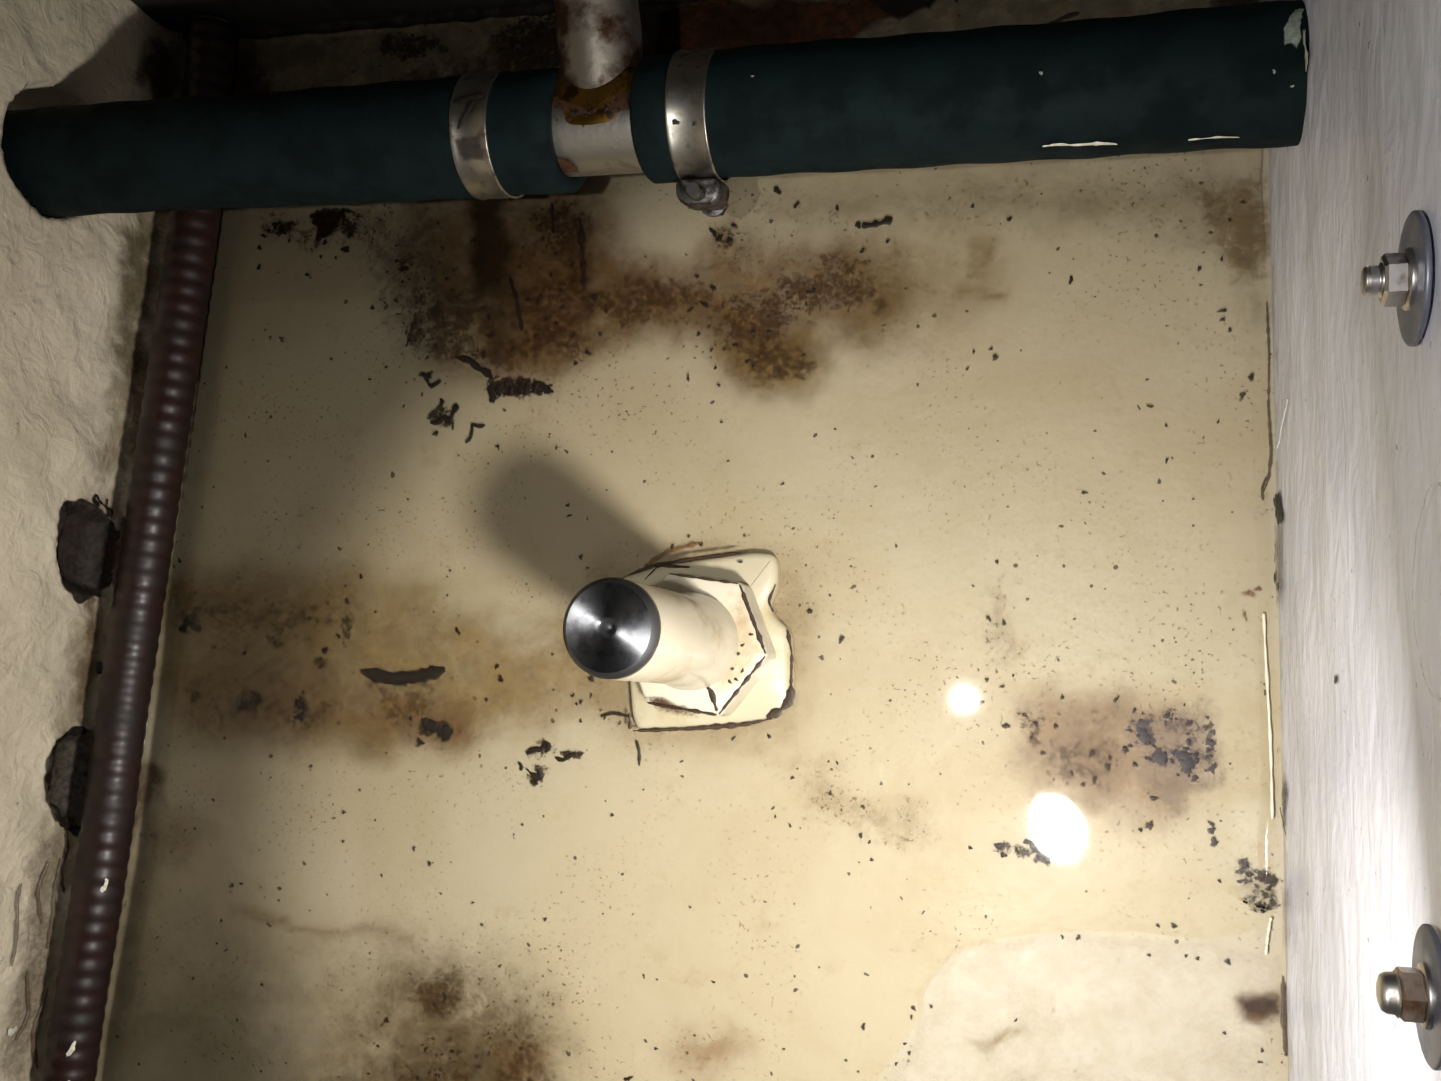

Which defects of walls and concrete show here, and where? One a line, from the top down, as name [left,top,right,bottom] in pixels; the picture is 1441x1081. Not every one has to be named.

rust [655,0,935,55]
rust [418,196,904,387]
spalling [56,494,124,604]
damp [645,535,703,566]
damp [173,565,570,746]
spalling [8,726,93,1069]
damp [360,964,546,1081]